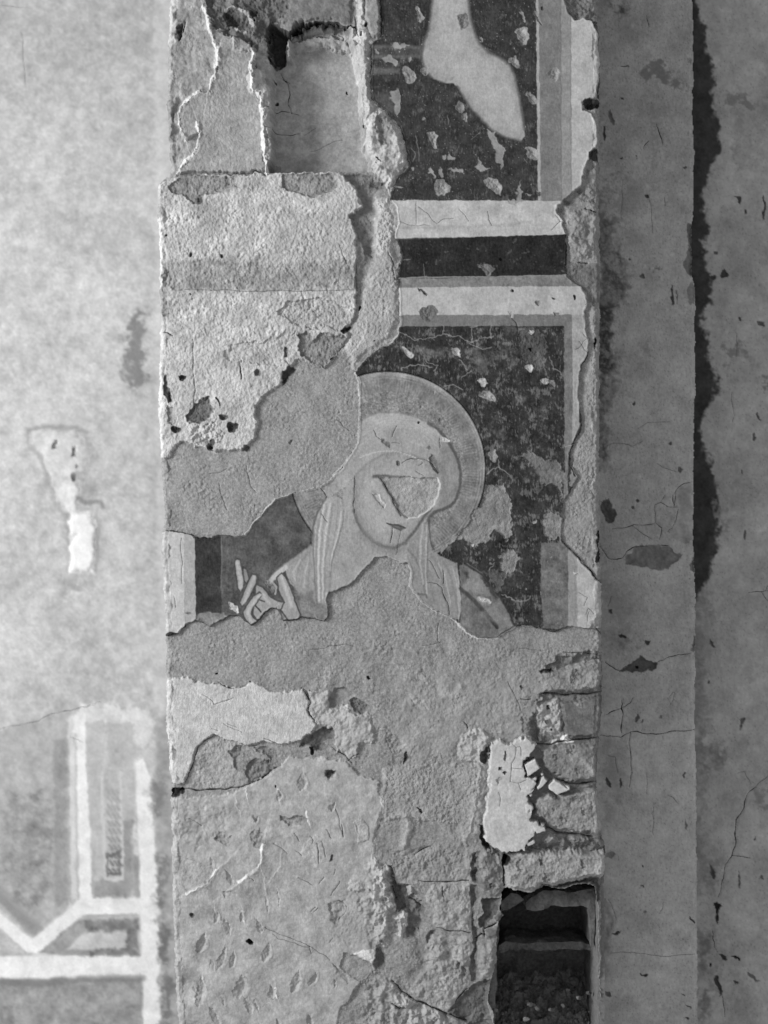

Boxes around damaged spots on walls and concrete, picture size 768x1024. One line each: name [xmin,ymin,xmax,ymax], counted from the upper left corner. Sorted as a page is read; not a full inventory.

spalling [205,0,356,72]
spalling [168,171,403,262]
spalling [223,297,361,385]
spalling [163,375,225,454]
spalling [625,467,693,571]
crack [520,464,690,671]
spalling [172,734,279,798]
crack [184,736,277,791]
spalling [299,726,334,751]
spalling [479,747,507,787]
flaking render [524,757,588,825]
crack [721,771,768,884]